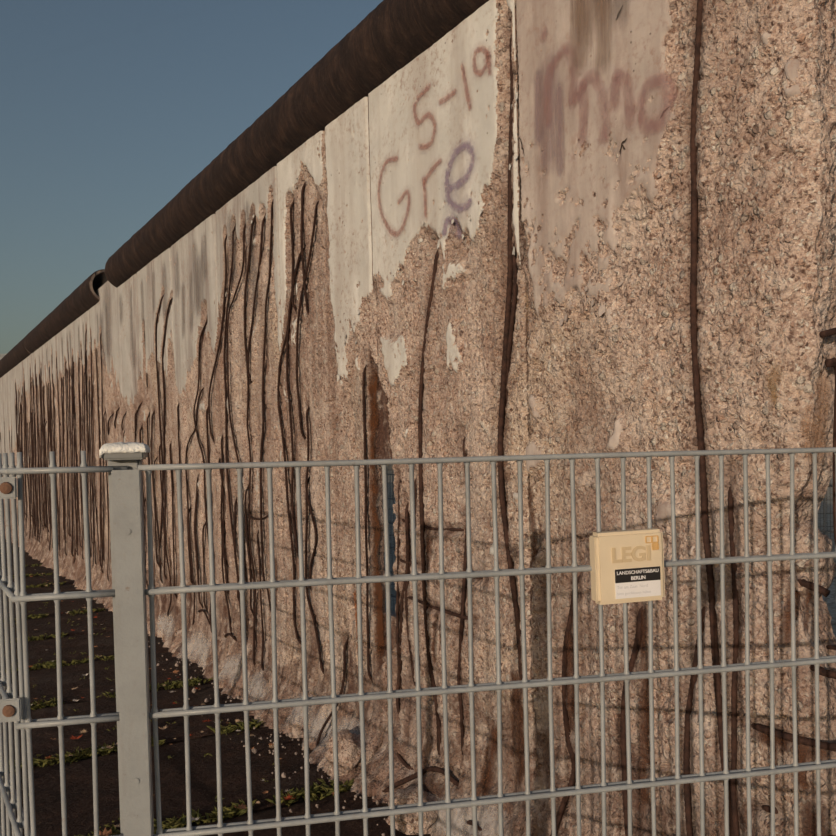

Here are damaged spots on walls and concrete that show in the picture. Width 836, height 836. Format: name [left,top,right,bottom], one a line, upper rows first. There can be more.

spalling [0,0,836,590]
rust [368,372,384,657]
spalling [93,597,113,612]
spalling [146,560,815,702]
rust [783,590,812,645]
spalling [797,579,830,597]
spalling [249,664,836,803]
spalling [430,769,834,836]